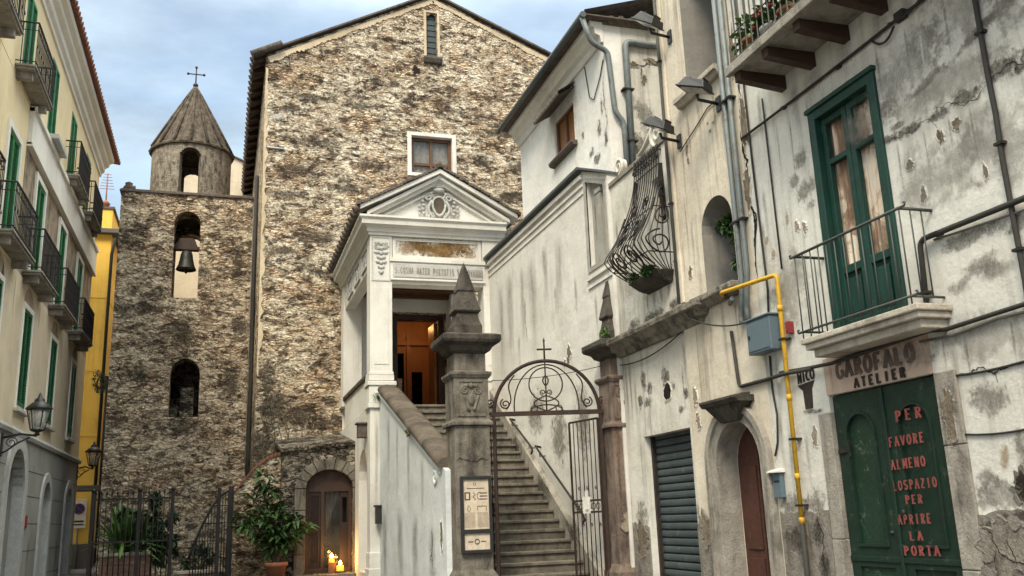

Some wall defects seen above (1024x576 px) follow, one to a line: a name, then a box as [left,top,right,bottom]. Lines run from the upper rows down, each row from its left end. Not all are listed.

damp [990,52,1024,81]
damp [884,52,980,144]
crack [886,61,1024,143]
spalling [935,115,962,146]
spalling [905,158,915,173]
spalling [982,161,990,182]
damp [942,221,995,250]
damp [951,251,1007,292]
spalling [662,379,673,404]
flaking render [692,386,702,432]
damp [1001,435,1024,472]
spalling [974,464,1024,576]